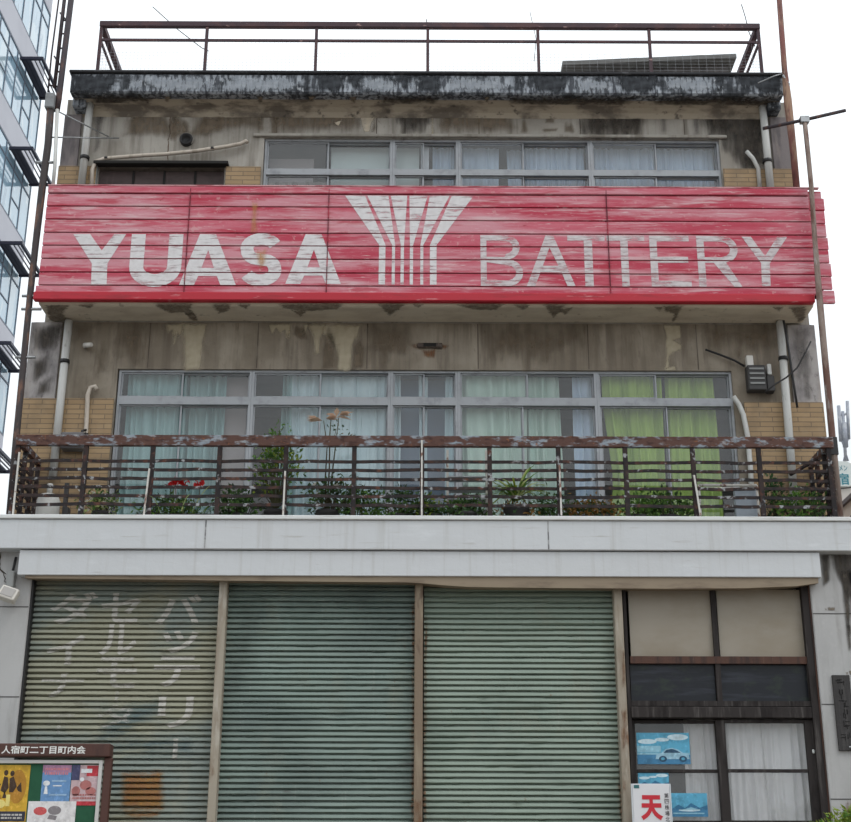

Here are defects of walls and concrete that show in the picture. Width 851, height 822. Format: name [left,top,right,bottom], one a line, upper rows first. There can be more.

leakage [304,74,362,93]
mould [383,74,440,104]
leakage [130,117,355,137]
leakage [35,327,62,349]
leakage [269,324,363,370]
leakage [34,361,47,392]
leakage [822,554,851,648]